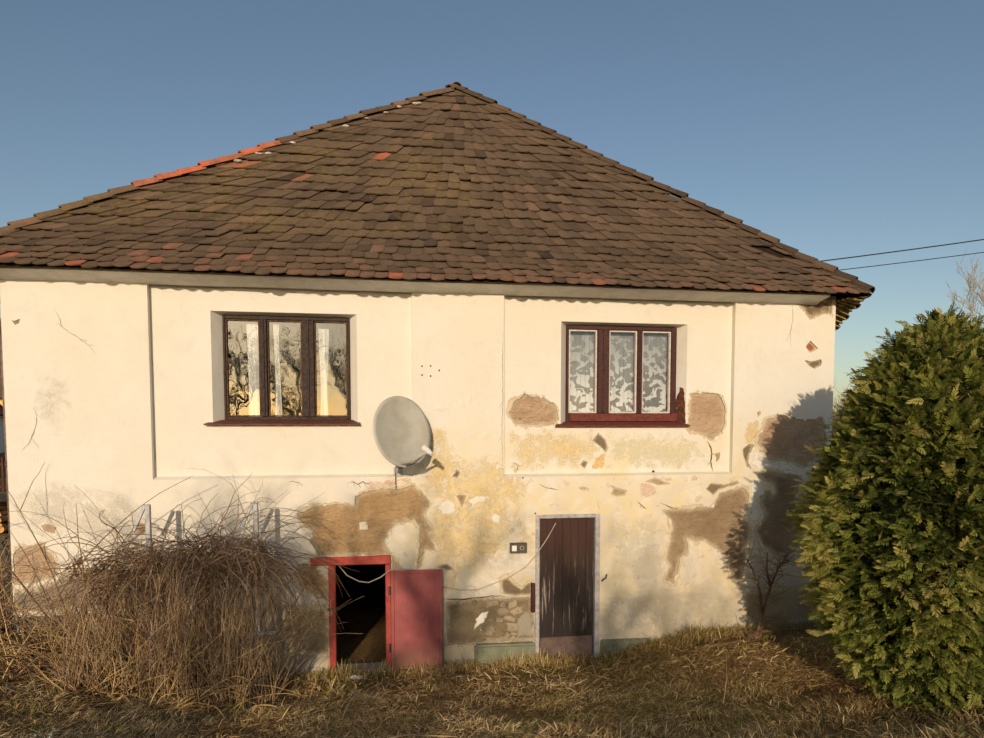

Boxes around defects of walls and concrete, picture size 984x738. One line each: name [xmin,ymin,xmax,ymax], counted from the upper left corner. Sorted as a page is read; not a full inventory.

flaking render [805,341,822,369]
flaking render [506,392,608,469]
flaking render [675,387,727,441]
flaking render [610,485,627,497]
flaking render [645,470,669,485]
flaking render [282,431,535,659]
flaking render [662,410,827,628]